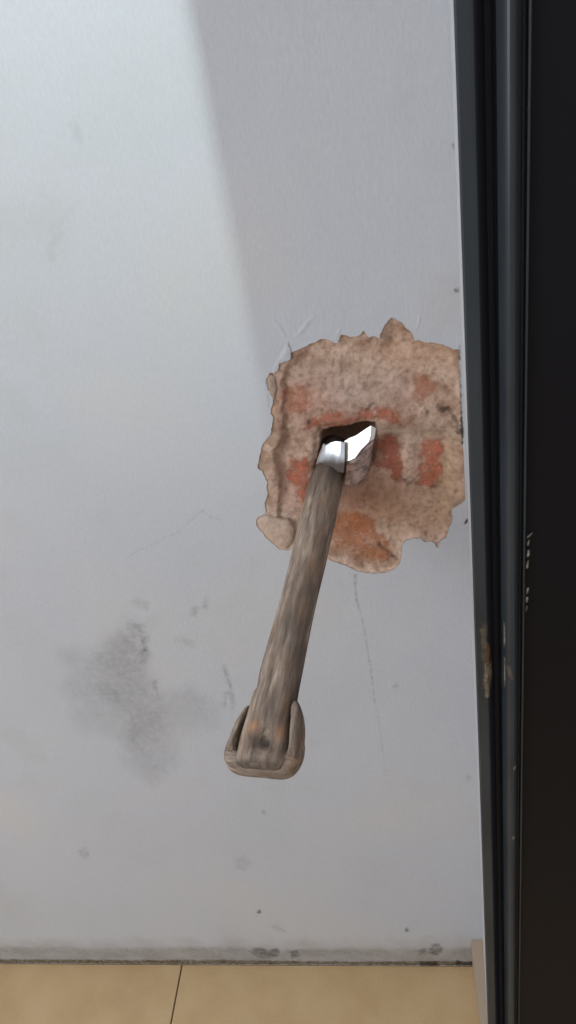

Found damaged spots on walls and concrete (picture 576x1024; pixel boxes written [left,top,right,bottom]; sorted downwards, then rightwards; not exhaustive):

flaking render [256,318,465,574]